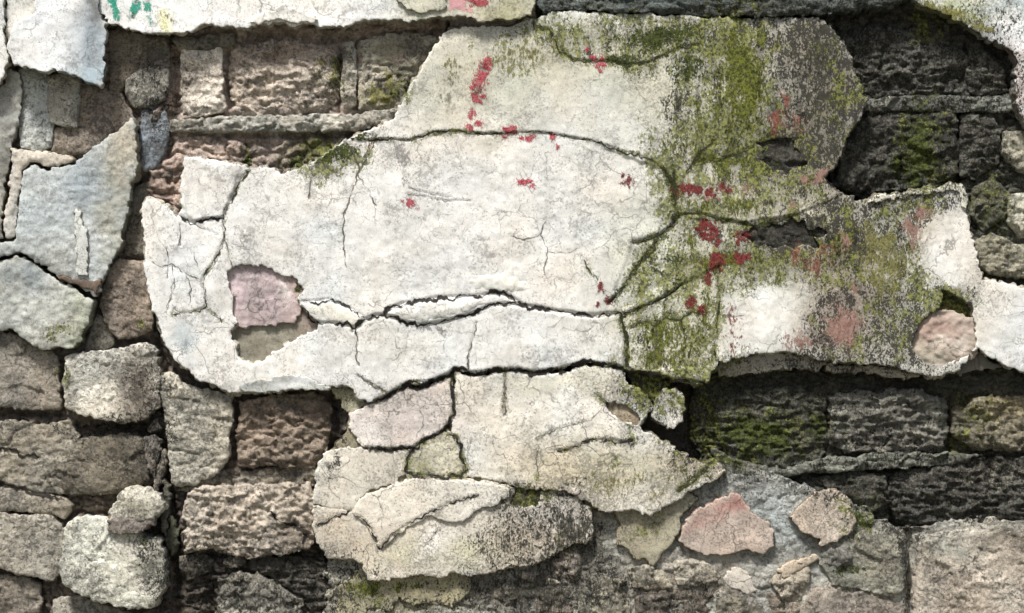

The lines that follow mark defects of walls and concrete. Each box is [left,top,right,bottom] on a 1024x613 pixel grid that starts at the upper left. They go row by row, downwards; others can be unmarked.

spalling [0,0,450,215]
water stain [602,46,641,69]
water stain [661,50,720,157]
water stain [783,23,851,152]
spalling [0,327,168,448]
crack [152,170,251,323]
spalling [108,314,349,485]
spalling [228,264,318,363]
crack [267,129,796,550]
water stain [647,227,720,329]
spalling [353,290,1024,613]
water stain [687,196,776,216]